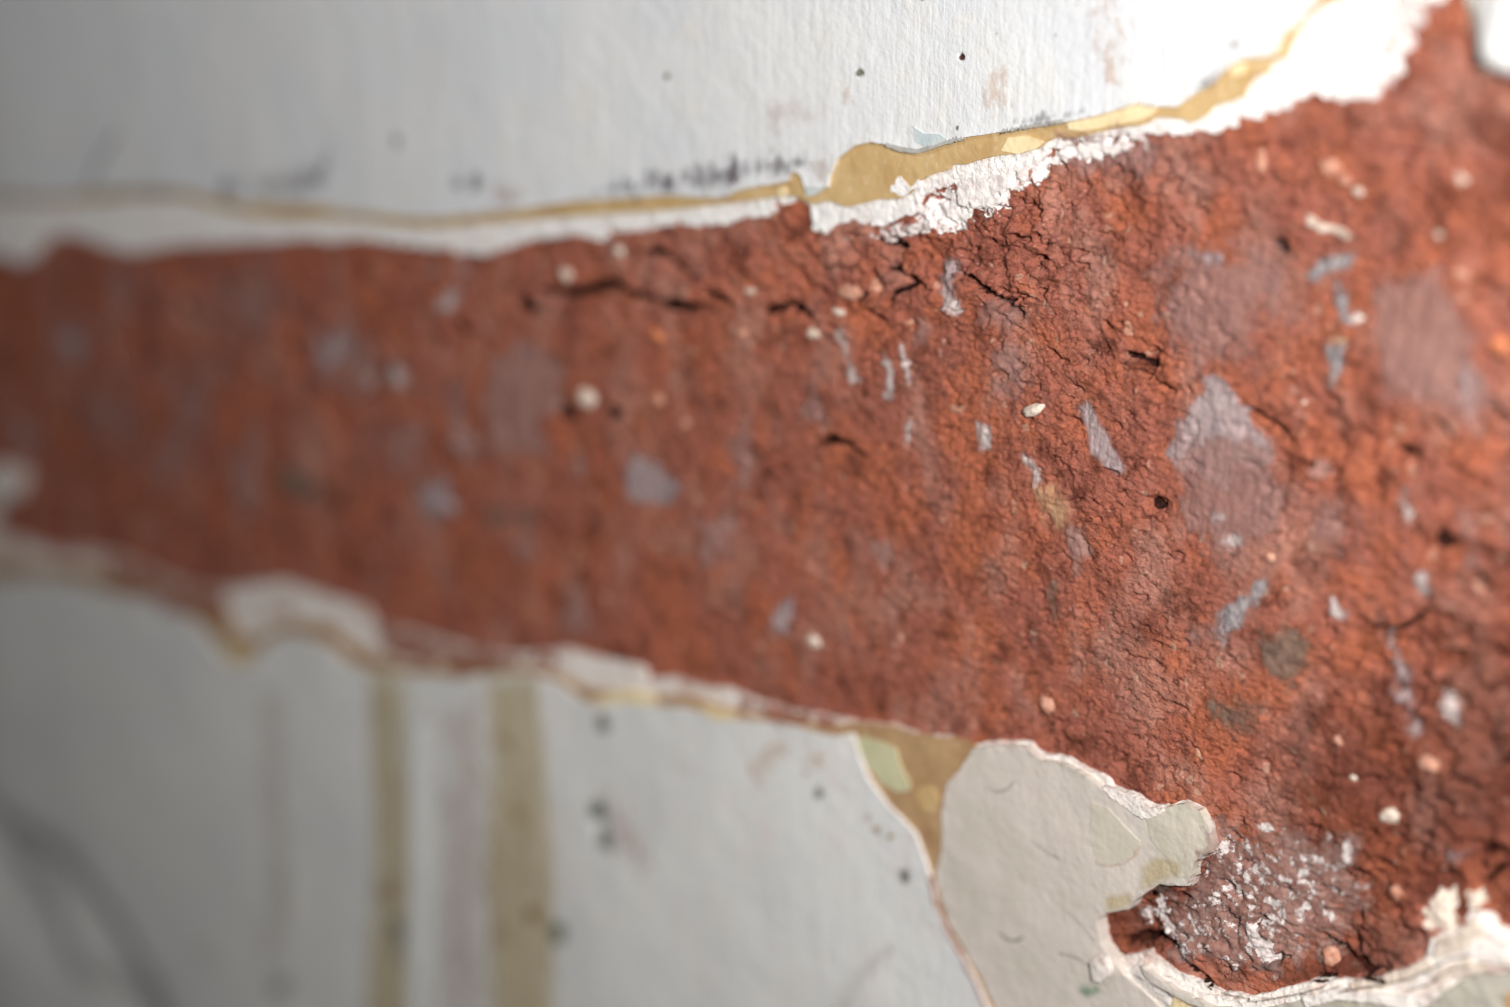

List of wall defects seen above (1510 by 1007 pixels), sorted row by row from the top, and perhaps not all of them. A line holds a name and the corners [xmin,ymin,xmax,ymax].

flaking render [1054,0,1406,147]
flaking render [0,190,799,264]
peeling [564,172,825,217]
peeling [802,118,1066,234]
flaking render [1022,403,1045,417]
flaking render [0,526,922,735]
leakage [369,679,408,1007]
leakage [489,682,565,1007]
peeling [841,722,995,1007]
peeling [936,739,1219,1007]
peeling [1117,947,1358,1007]
peeling [1302,909,1510,1007]